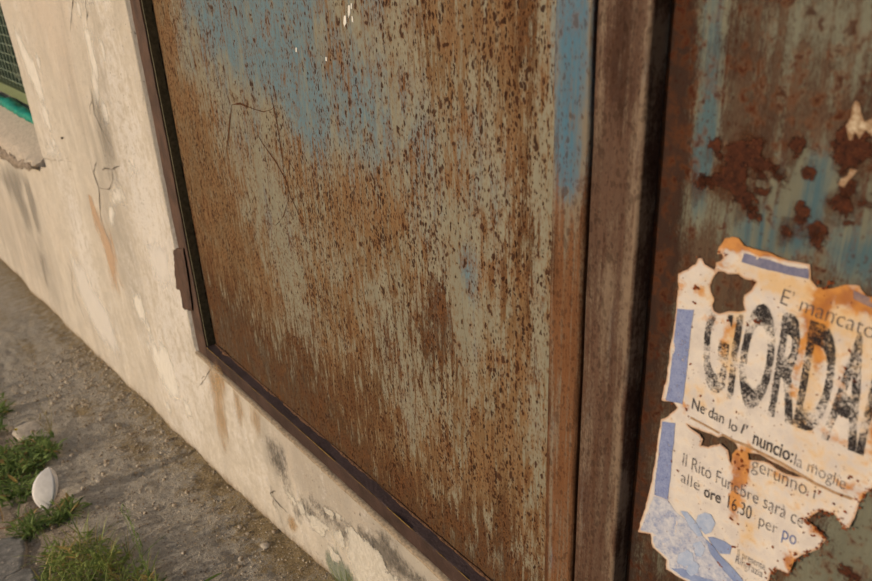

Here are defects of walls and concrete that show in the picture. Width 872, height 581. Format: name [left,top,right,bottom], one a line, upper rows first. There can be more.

crack [43,157,119,250]
rust [693,137,789,224]
rust [787,136,807,159]
rust [781,200,829,250]
rust [801,166,817,181]
rust [826,120,872,226]
rust [754,466,872,581]